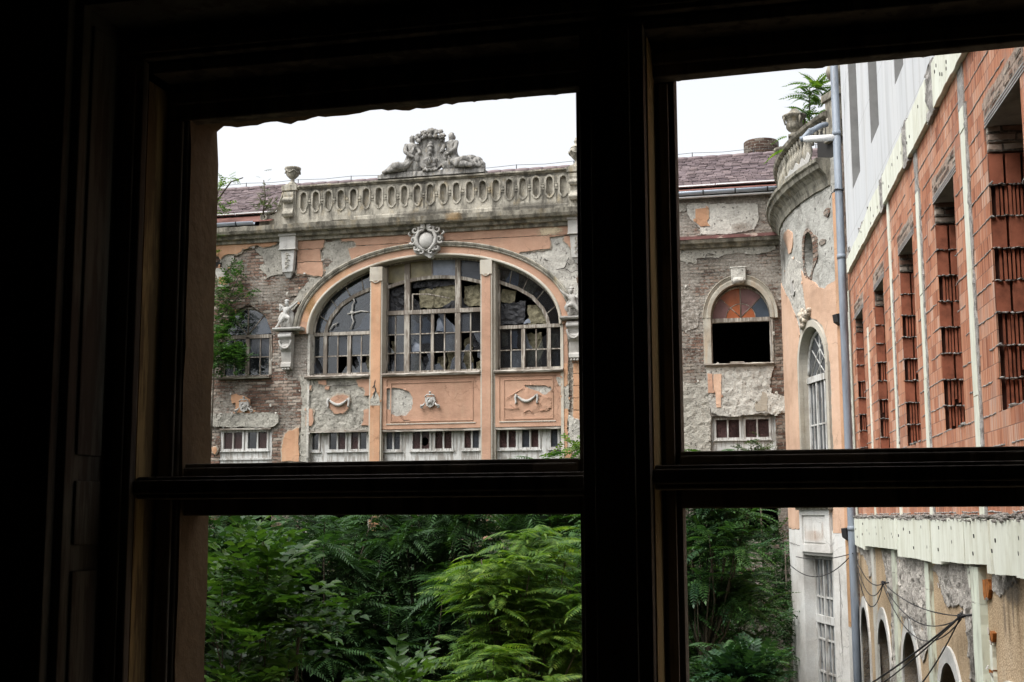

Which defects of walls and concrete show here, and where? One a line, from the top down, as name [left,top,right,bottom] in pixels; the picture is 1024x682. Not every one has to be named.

peeling [520,234,578,295]
peeling [679,202,776,264]
flaking render [211,239,413,463]
peeling [525,341,580,458]
peeling [681,228,826,451]
spalling [858,546,980,682]